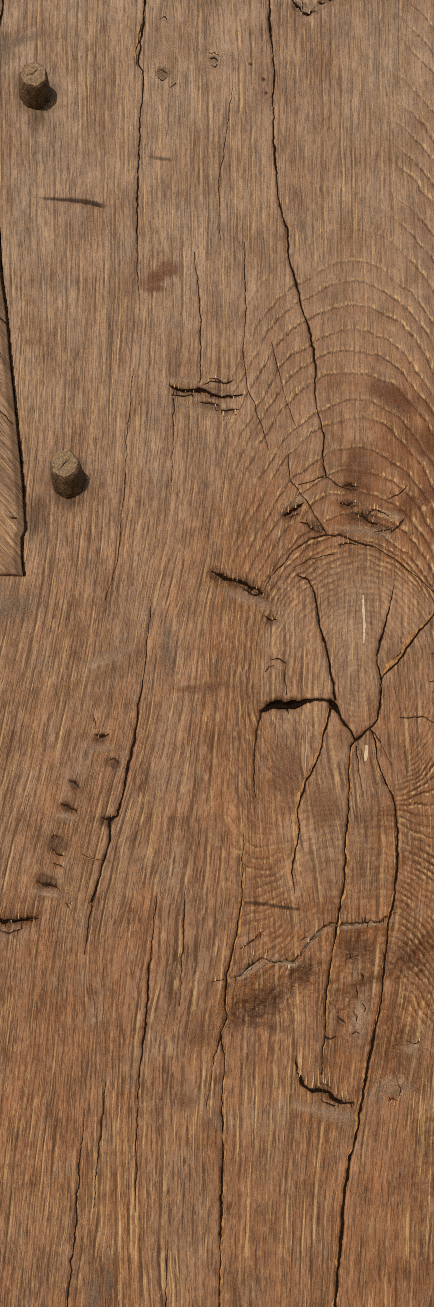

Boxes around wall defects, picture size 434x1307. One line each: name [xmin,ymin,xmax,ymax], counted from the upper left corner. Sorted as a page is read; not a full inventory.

crack [105,373,134,599]
crack [133,0,434,1307]
crack [82,612,151,954]
crack [0,915,38,934]
crack [67,1083,106,1307]